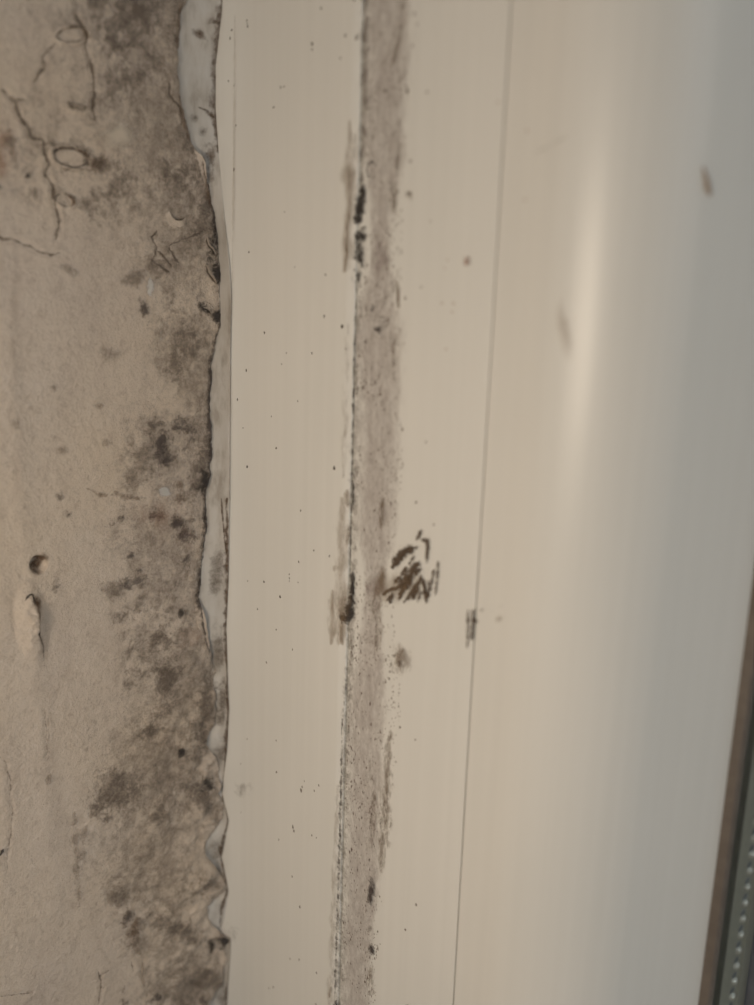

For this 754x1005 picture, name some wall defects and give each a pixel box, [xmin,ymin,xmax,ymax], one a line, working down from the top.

crack [0,44,60,256]
crack [75,14,96,121]
water stain [128,6,232,926]
water stain [334,0,418,998]
water stain [208,937,229,953]